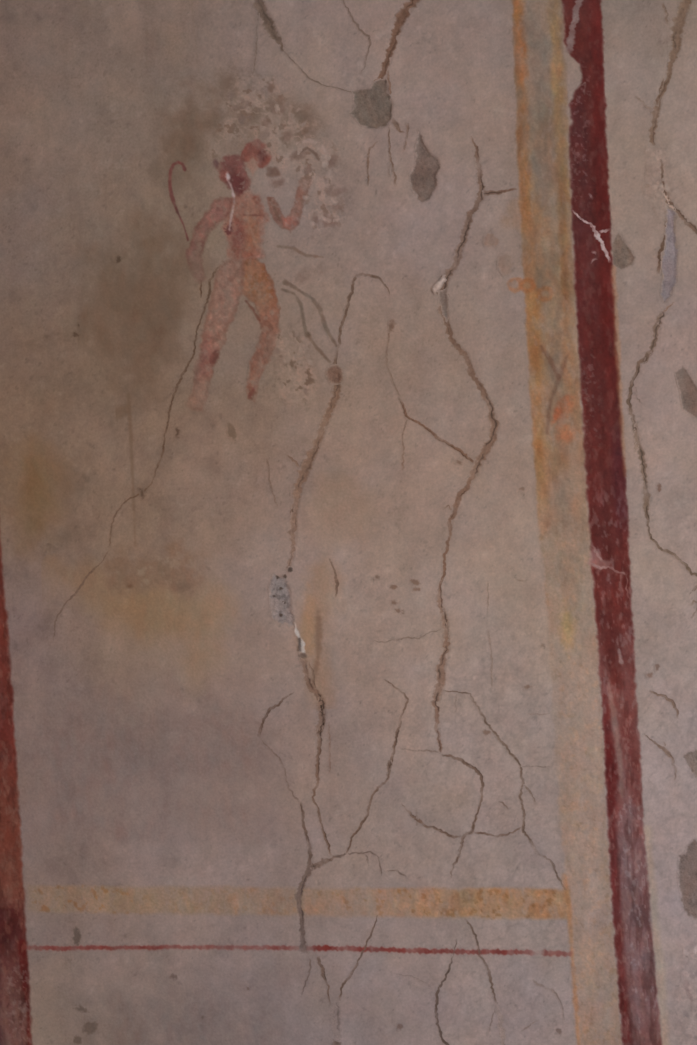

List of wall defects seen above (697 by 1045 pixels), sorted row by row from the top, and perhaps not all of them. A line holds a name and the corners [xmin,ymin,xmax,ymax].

peeling [207,68,352,241]
crack [251,0,422,186]
crack [634,0,697,274]
crack [53,264,221,641]
flaking render [278,613,308,660]
crack [257,136,567,1045]
crack [626,301,697,619]